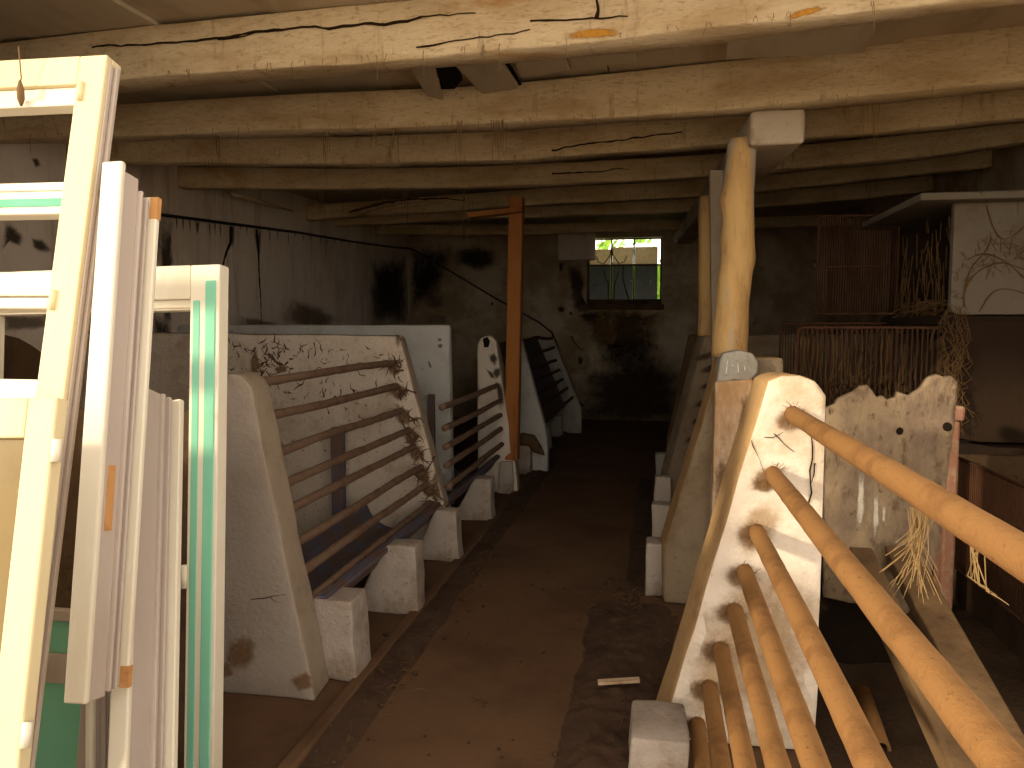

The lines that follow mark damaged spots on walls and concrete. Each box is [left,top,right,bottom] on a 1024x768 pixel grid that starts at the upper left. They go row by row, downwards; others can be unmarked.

crack [92,0,628,48]
crack [552,131,682,175]
crack [222,226,262,322]
damp [371,249,446,320]
damp [459,248,494,270]
crack [751,432,816,503]